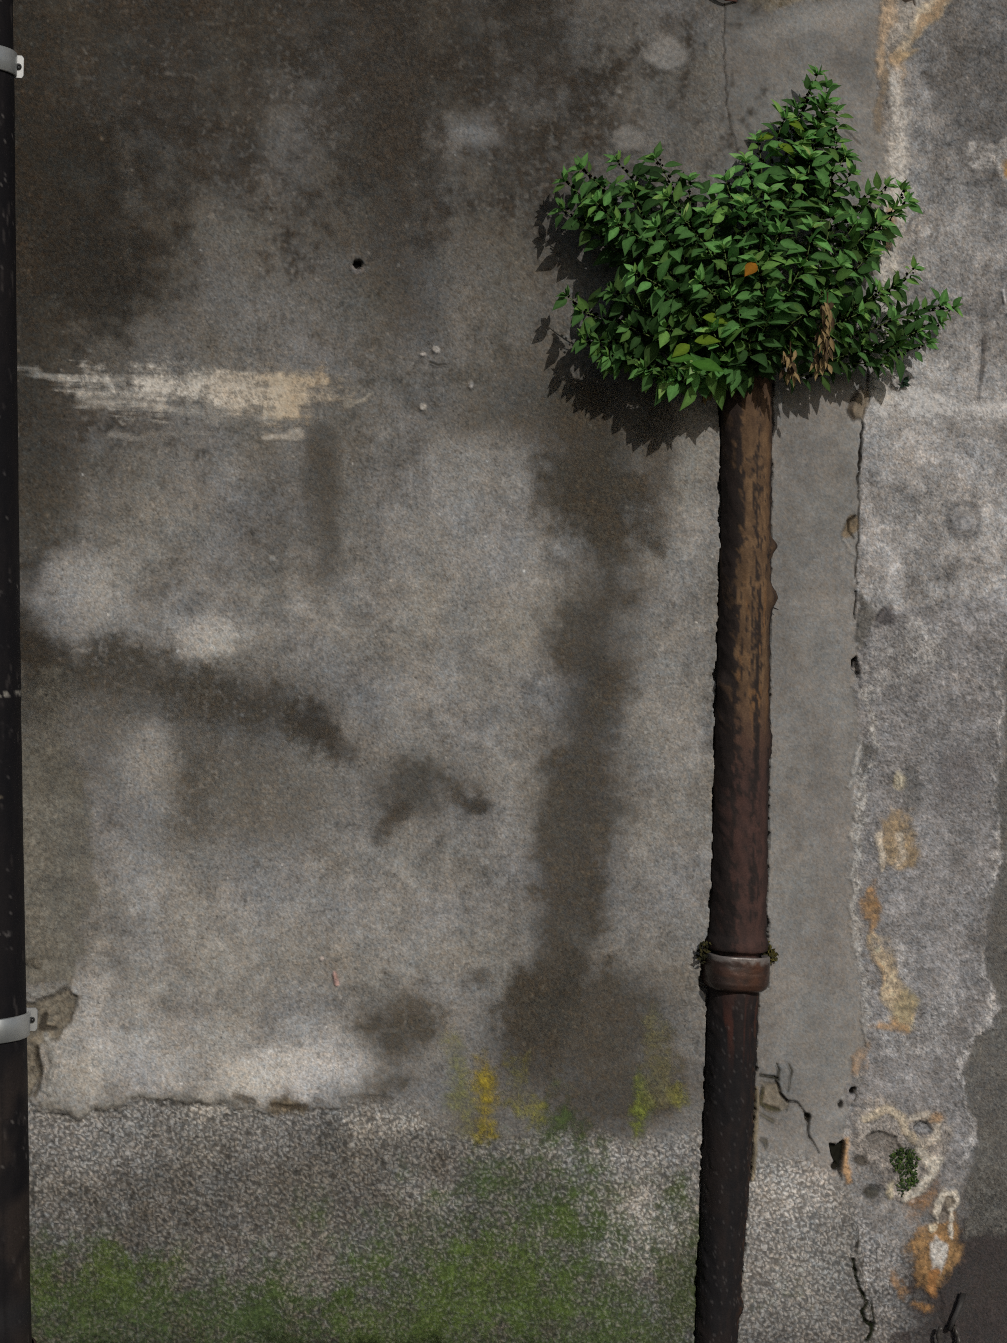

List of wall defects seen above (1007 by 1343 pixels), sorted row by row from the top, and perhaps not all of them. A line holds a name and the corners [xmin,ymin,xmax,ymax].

peeling [34,364,369,440]
crack [854,371,868,619]
crack [851,656,861,689]
peeling [829,0,1007,1253]
leakage [20,631,342,992]
leakage [501,382,688,1139]
spalling [26,989,255,1117]
spalling [270,1098,307,1113]
crack [760,1064,819,1153]
crack [852,1225,875,1342]
rust [892,1190,962,1311]